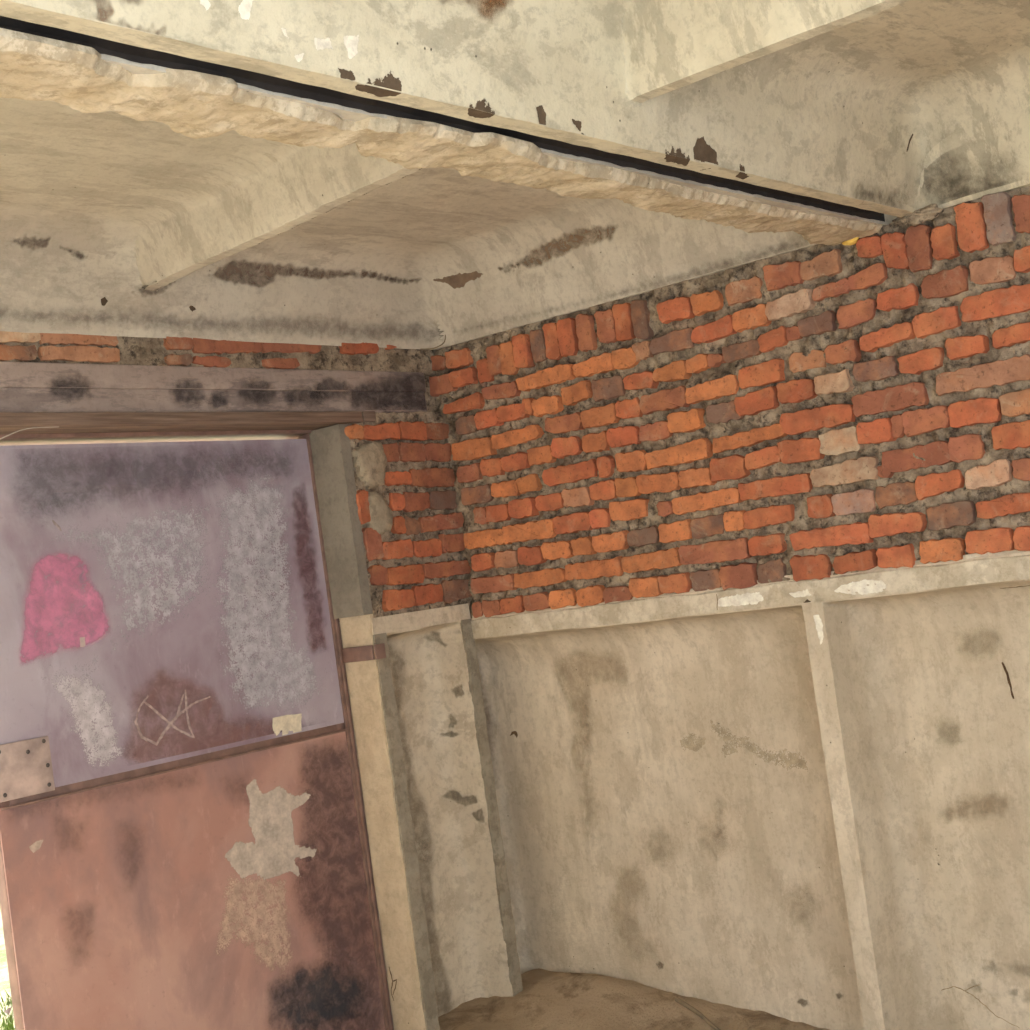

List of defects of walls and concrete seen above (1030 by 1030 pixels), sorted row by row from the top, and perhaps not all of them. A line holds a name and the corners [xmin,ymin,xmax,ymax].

peeling [238,0,254,20]
corrosion [468,0,507,17]
spalling [314,35,402,97]
spalling [467,99,495,118]
spalling [536,105,546,125]
spalling [664,136,718,171]
damp [499,227,615,271]
damp [215,261,419,287]
peeling [789,589,811,598]